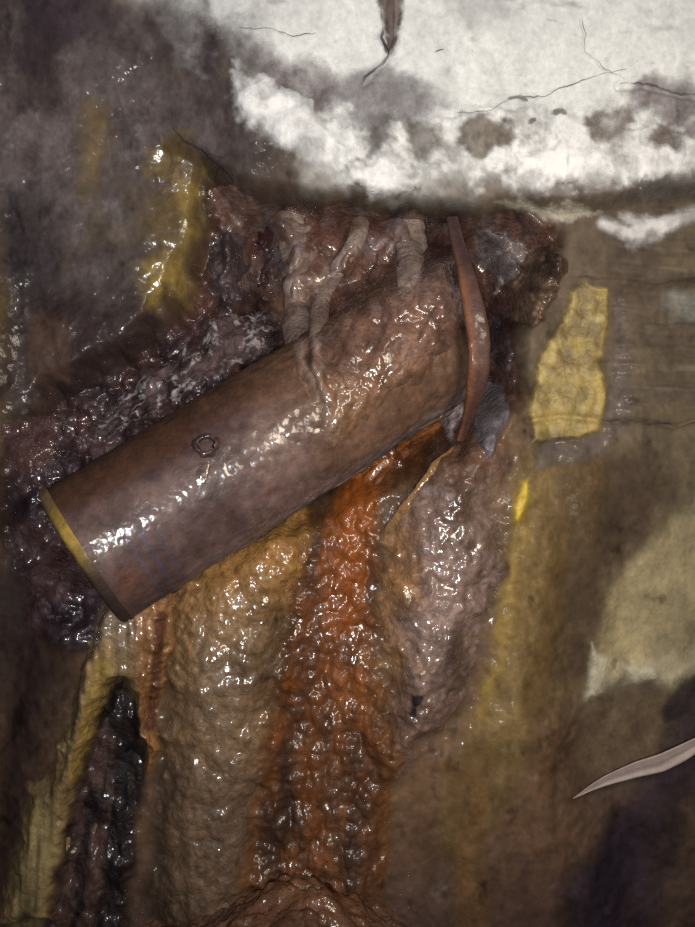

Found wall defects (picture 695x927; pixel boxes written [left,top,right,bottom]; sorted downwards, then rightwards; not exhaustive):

spalling [363,0,402,82]
crack [458,21,683,124]
damp [233,72,695,200]
damp [506,200,589,221]
damp [598,207,695,243]
damp [665,292,695,319]
damp [0,0,284,925]
damp [448,282,658,927]
rust [240,422,457,907]
damp [580,681,695,778]
damp [565,754,695,927]